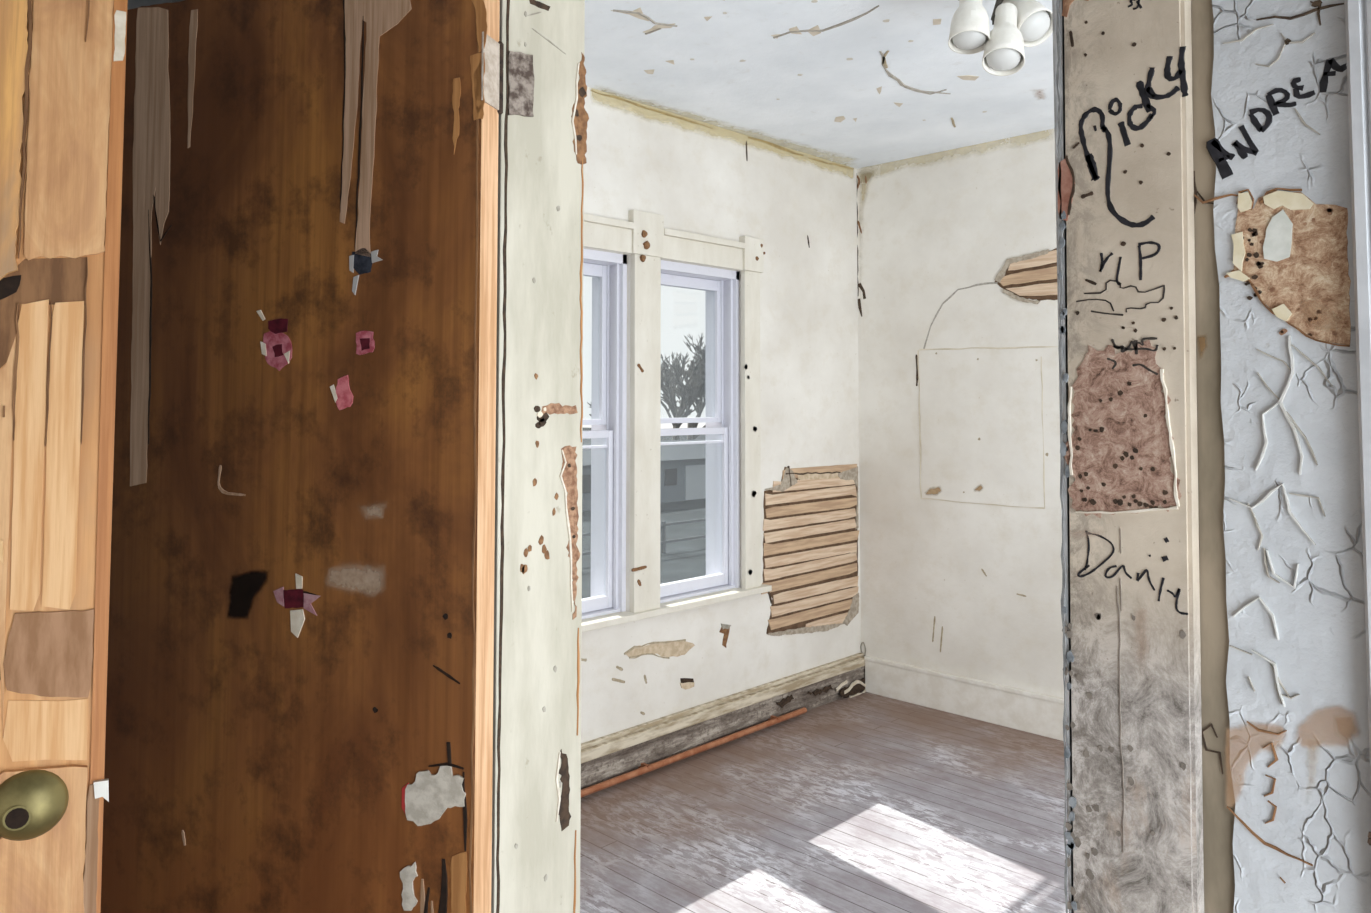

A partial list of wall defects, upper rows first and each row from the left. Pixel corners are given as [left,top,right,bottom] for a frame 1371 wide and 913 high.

spalling [994,156,1075,335]
spalling [1224,188,1351,347]
peeling [534,52,589,735]
peeling [1060,340,1182,518]
peeling [520,535,550,591]
peeling [624,639,695,659]
spalling [749,464,859,636]
crack [1202,335,1333,883]
peeling [555,749,577,913]
peeling [1065,796,1077,855]